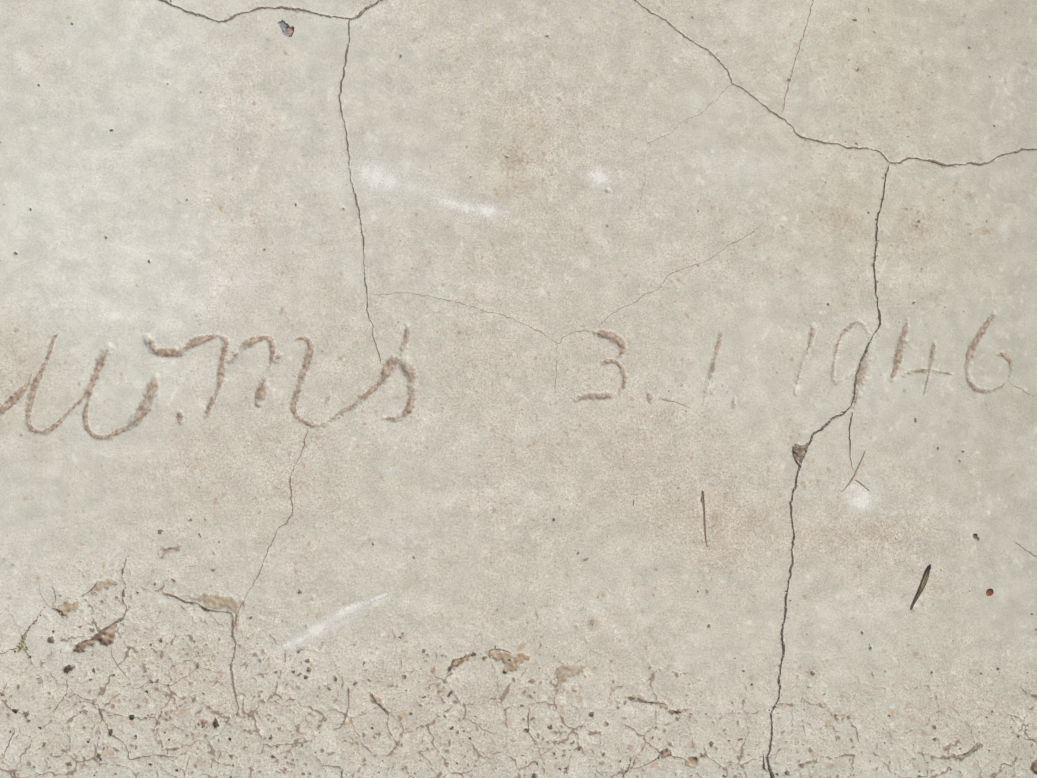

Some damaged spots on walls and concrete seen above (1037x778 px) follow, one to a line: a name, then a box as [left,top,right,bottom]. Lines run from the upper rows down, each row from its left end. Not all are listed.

crack [160,0,589,386]
crack [623,0,1037,778]
crack [0,588,56,654]
spalling [53,569,139,618]
spalling [74,618,124,653]
crack [55,431,308,768]
spalling [167,593,252,627]
spalling [448,646,530,673]
spalling [556,664,585,694]
spalling [370,694,394,719]
spalling [628,695,693,716]
spalling [943,740,990,770]